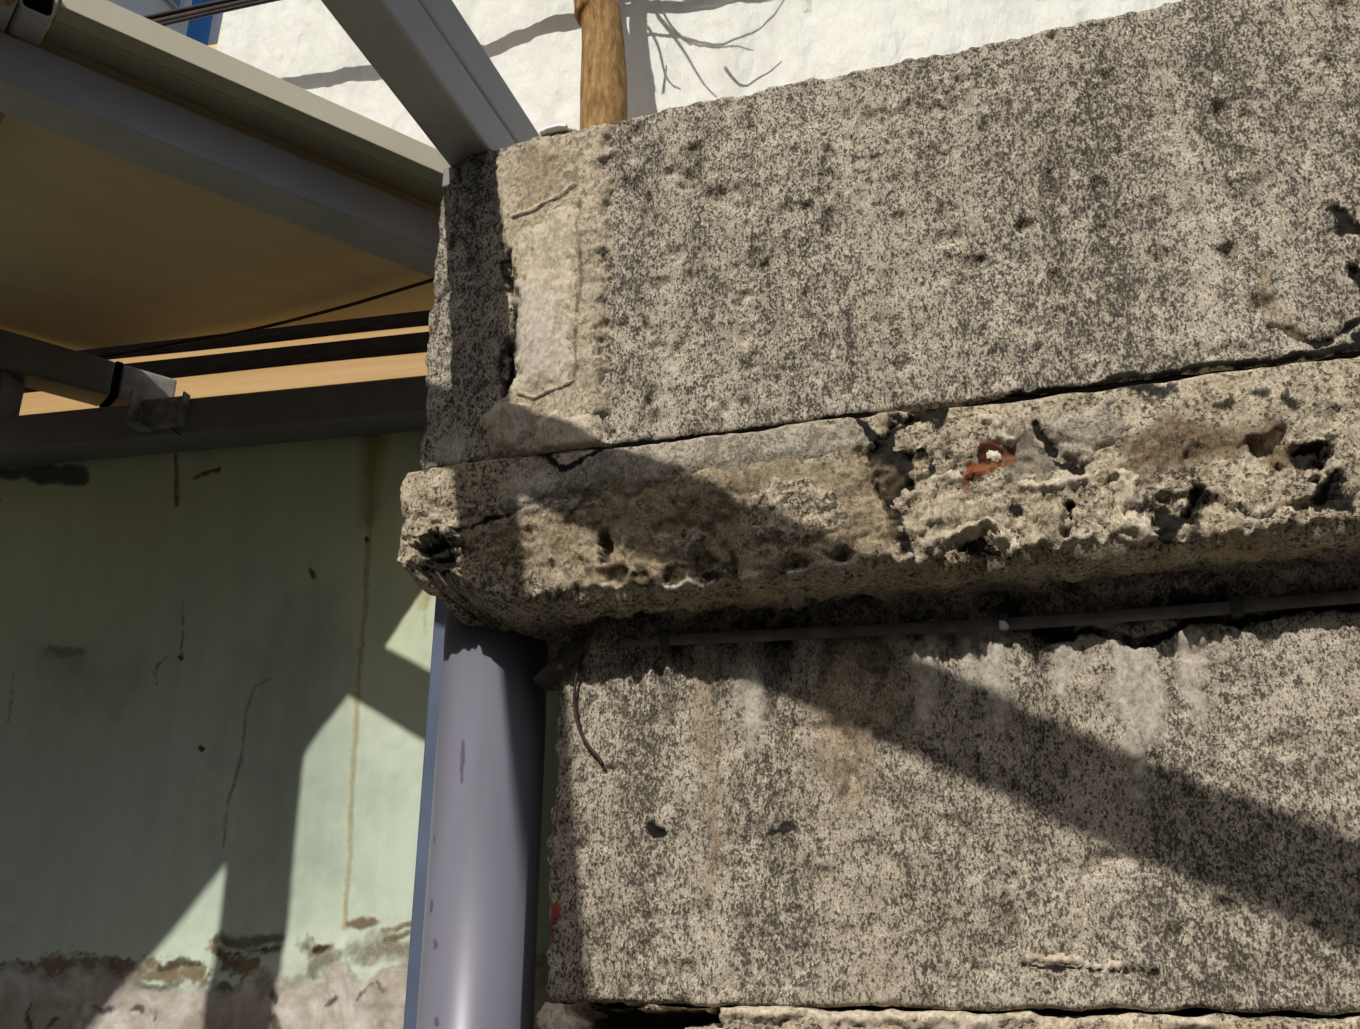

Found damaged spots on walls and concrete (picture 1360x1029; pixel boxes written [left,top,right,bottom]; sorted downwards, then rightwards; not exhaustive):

crack [497,254,523,398]
crack [986,201,1360,405]
crack [537,426,781,472]
spalling [417,394,1131,591]
crack [821,412,876,420]
rust [962,441,1016,493]
spalling [1109,467,1211,545]
hole [1255,439,1356,513]
peeling [0,932,285,991]